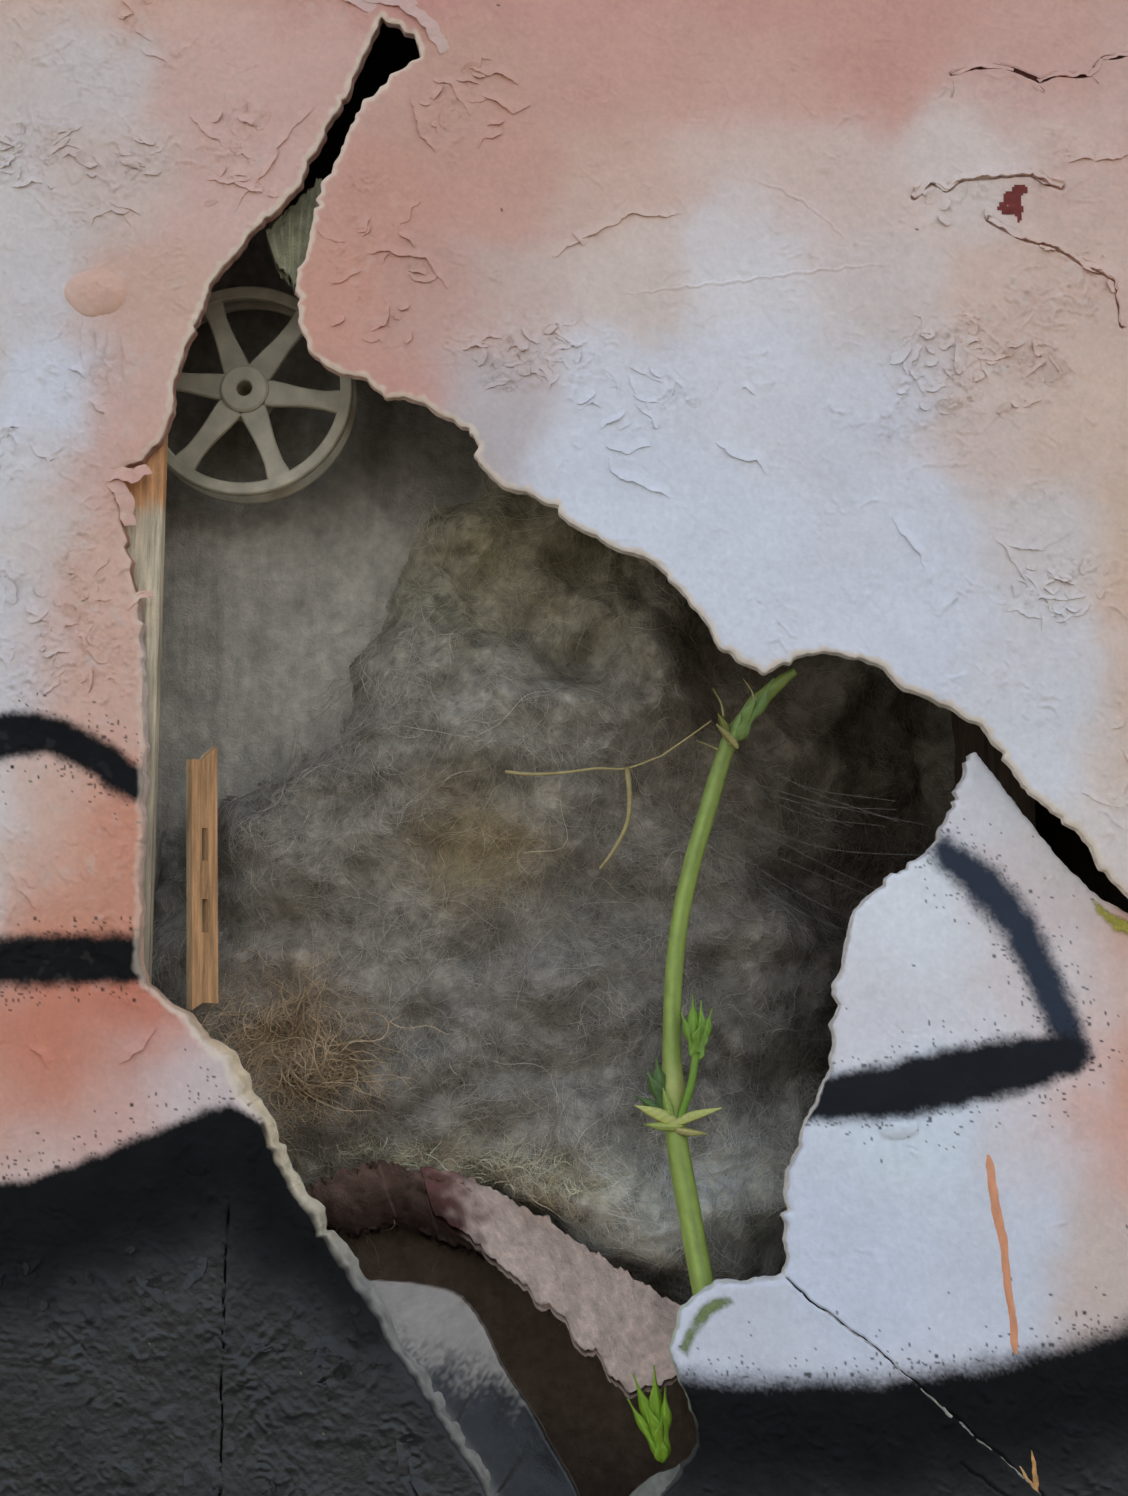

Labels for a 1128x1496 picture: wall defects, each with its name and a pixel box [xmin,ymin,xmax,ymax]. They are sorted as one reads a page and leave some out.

peeling [344,0,449,54]
crack [950,47,1128,93]
spalling [282,84,385,213]
peeling [318,198,452,289]
peeling [906,162,1128,327]
peeling [362,293,413,344]
peeling [460,311,588,392]
peeling [887,308,1069,418]
peeling [992,533,1104,635]
spalling [1035,800,1128,913]
crack [218,1208,229,1496]
crack [788,1279,1043,1496]